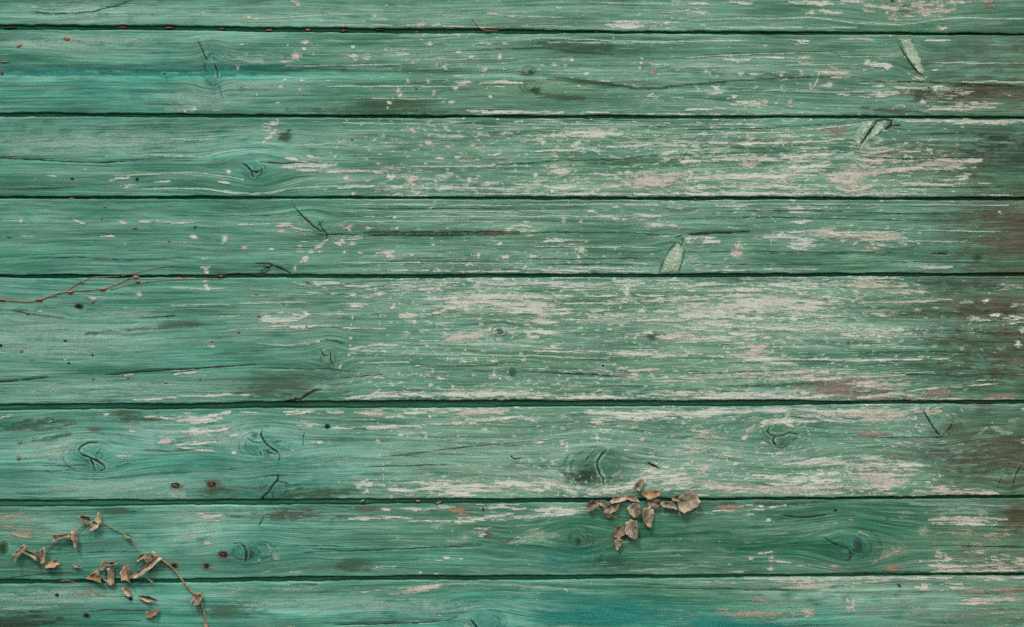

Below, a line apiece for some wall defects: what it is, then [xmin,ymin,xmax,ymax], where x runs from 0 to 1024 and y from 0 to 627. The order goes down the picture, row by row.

peeling [590,0,1022,42]
crack [292,203,991,273]
peeling [110,38,1024,546]
peeling [54,479,186,497]
crack [37,442,205,471]
crack [233,431,305,562]
crack [583,450,606,484]
peeling [699,503,1024,605]